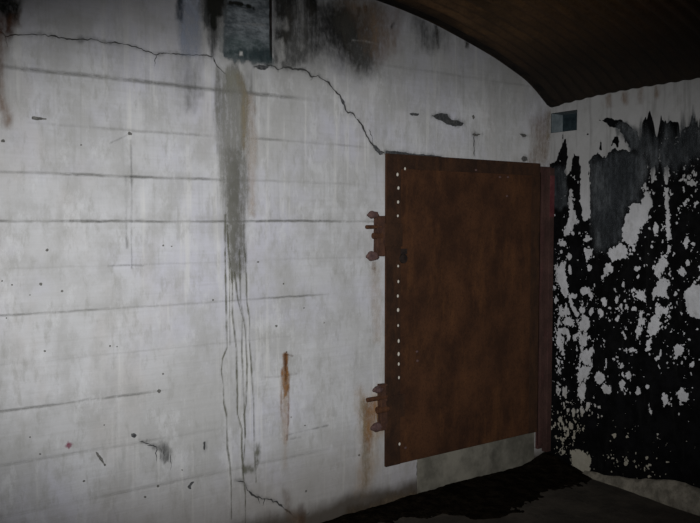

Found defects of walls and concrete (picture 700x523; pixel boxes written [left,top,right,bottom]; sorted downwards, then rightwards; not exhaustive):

crack [3,33,226,74]
water stain [275,0,389,70]
crack [255,65,384,155]
spalling [432,113,463,127]
water stain [215,66,254,314]
peeling [549,78,700,478]
rust [281,353,289,397]
crack [238,481,310,522]